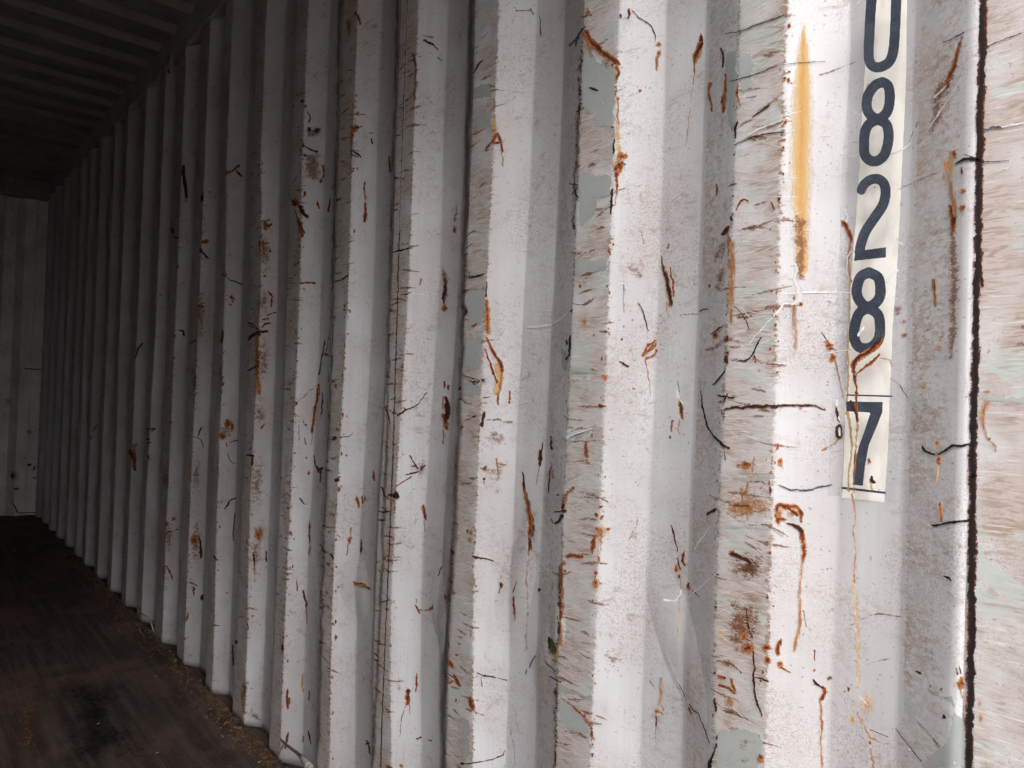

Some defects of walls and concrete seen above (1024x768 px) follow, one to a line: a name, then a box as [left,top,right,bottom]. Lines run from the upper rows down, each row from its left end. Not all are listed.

peeling [577,169,612,227]
peeling [581,42,616,126]
rust [569,29,628,236]
rust [771,13,810,280]
rust [441,381,460,443]
peeling [461,289,485,370]
rust [460,284,513,445]
rust [927,0,1024,768]
rust [538,474,610,653]
rust [713,443,807,685]
peeling [715,729,766,768]